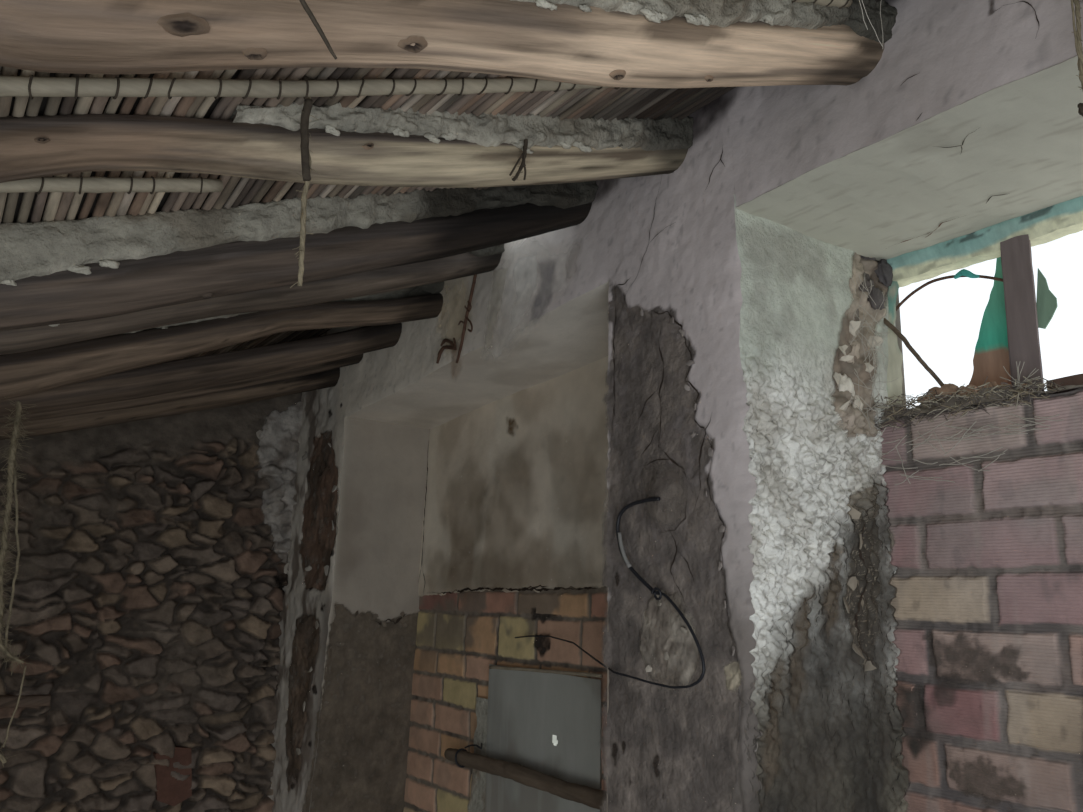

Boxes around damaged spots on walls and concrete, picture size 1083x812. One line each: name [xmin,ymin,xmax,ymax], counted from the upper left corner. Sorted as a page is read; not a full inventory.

spalling [832,252,893,437]
peeling [256,401,338,591]
spalling [600,286,741,812]
spalling [285,603,419,812]
leakage [753,498,961,812]